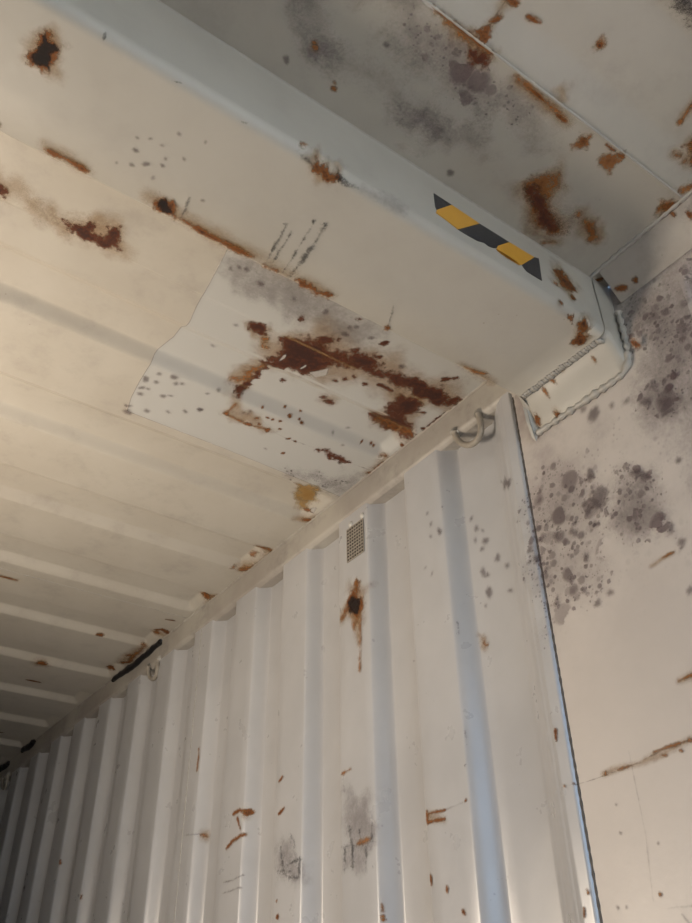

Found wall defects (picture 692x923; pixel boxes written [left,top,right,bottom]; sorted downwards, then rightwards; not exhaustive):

rust [25,30,60,73]
rust [311,154,341,183]
rust [61,219,122,251]
rust [152,197,255,258]
rust [523,172,569,244]
rust [553,269,588,345]
rust [224,321,462,447]
water stain [637,295,691,418]
water stain [617,464,662,495]
water stain [523,474,644,611]
water stain [650,513,671,533]
rust [340,579,363,645]